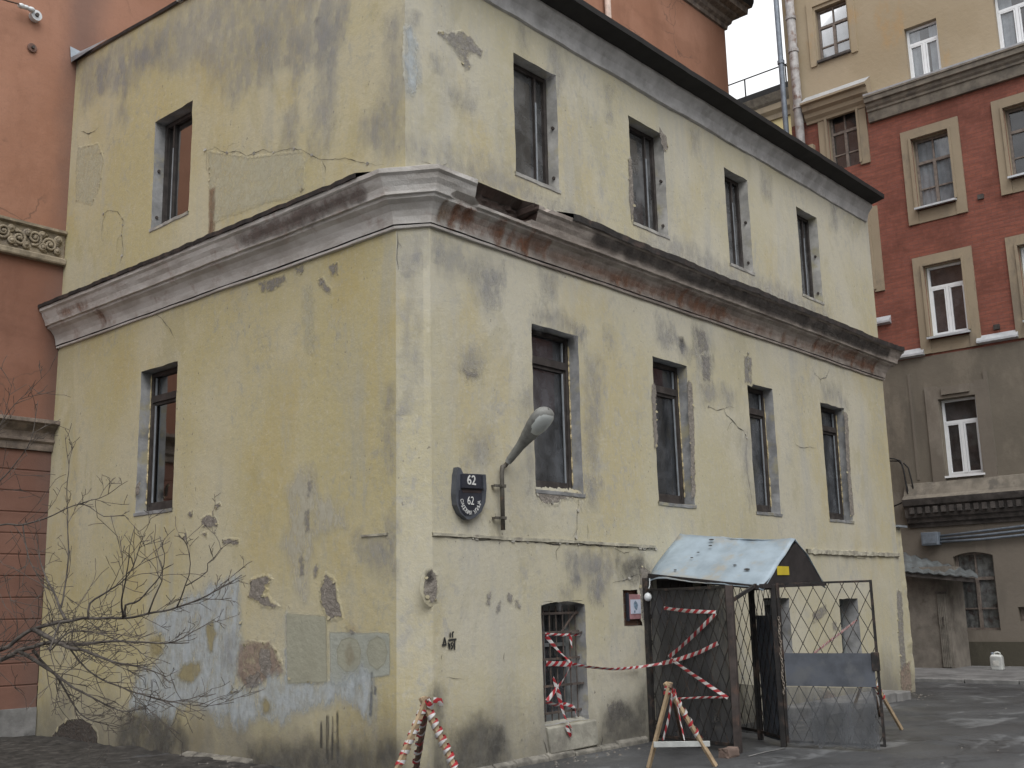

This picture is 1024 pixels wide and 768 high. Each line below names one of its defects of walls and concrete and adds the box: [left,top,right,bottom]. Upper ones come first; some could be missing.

peeling [436,29,483,72]
crack [203,145,381,170]
peeling [182,501,240,547]
flaking render [247,573,281,611]
flaking render [318,570,344,623]
flaking render [420,567,439,607]
peeling [230,638,291,694]